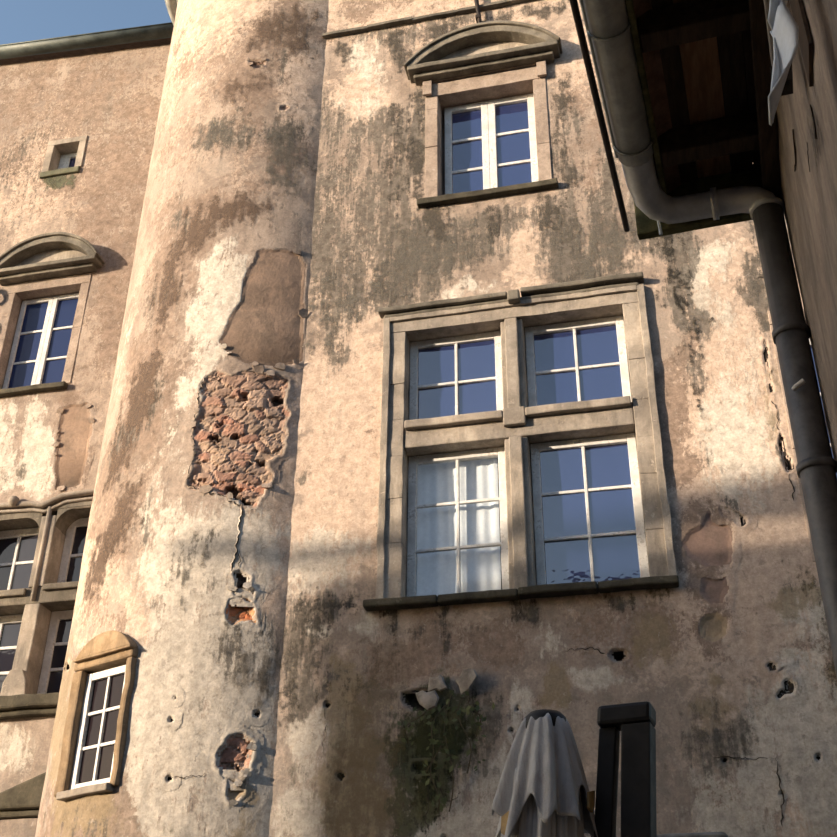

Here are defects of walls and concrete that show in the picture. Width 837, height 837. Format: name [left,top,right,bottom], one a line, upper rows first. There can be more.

damp [243,5,322,56]
damp [335,38,355,66]
damp [524,2,566,20]
damp [305,91,511,354]
damp [536,73,703,365]
flaking render [48,398,98,496]
flaking render [179,243,311,514]
crack [763,339,795,500]
flaking render [673,500,758,650]
flaking render [393,669,478,720]
flaking render [218,768,255,814]
crack [715,756,785,827]